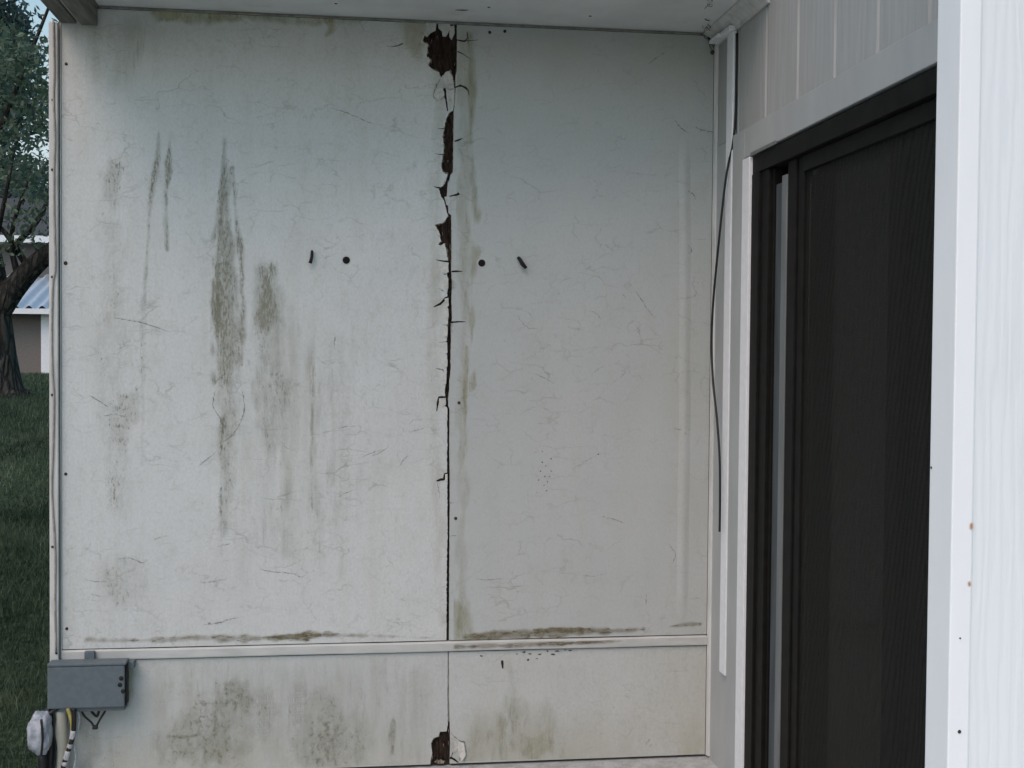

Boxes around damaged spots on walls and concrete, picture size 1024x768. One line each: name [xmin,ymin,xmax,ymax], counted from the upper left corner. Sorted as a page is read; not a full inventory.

peeling [425,21,455,40]
peeling [433,74,469,111]
water stain [148,149,171,216]
crack [434,181,460,213]
water stain [211,167,277,384]
crack [434,260,465,627]
peeling [434,738,466,764]